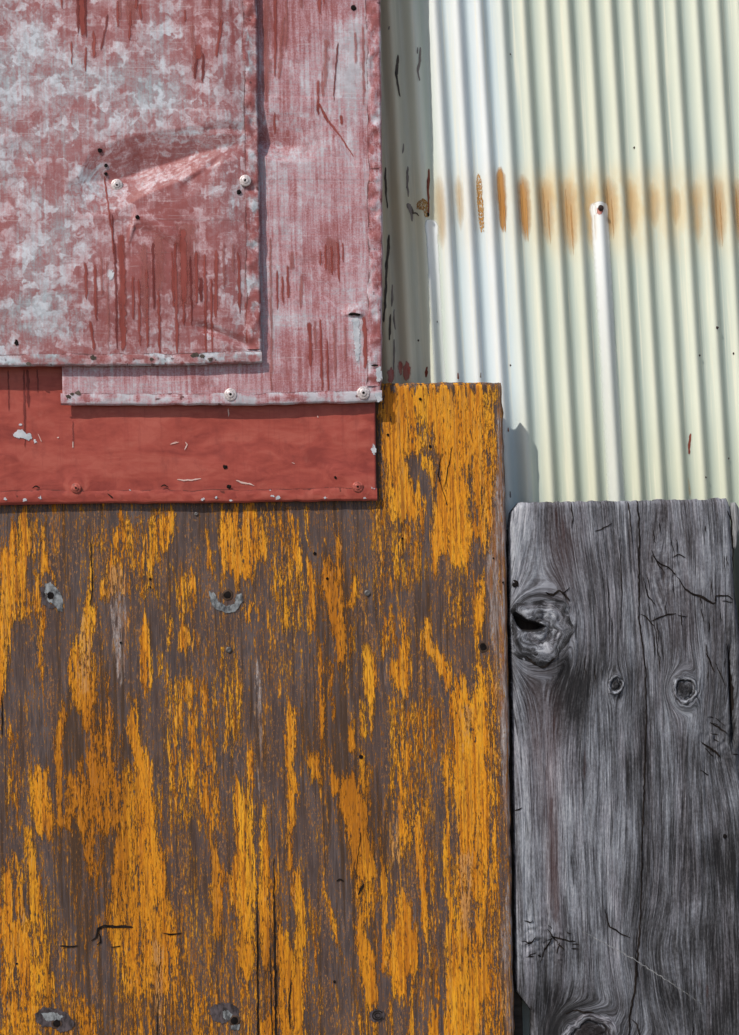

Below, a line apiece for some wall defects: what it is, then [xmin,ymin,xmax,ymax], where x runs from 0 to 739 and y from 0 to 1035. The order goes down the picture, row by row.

corrosion [476,174,484,232]
corrosion [497,169,506,232]
corrosion [519,181,529,236]
peeling [352,316,361,361]
crack [546,587,570,601]
crack [526,654,559,668]
peeling [0,366,508,1035]
crack [571,501,739,1035]
crack [61,925,133,948]
crack [522,920,579,962]